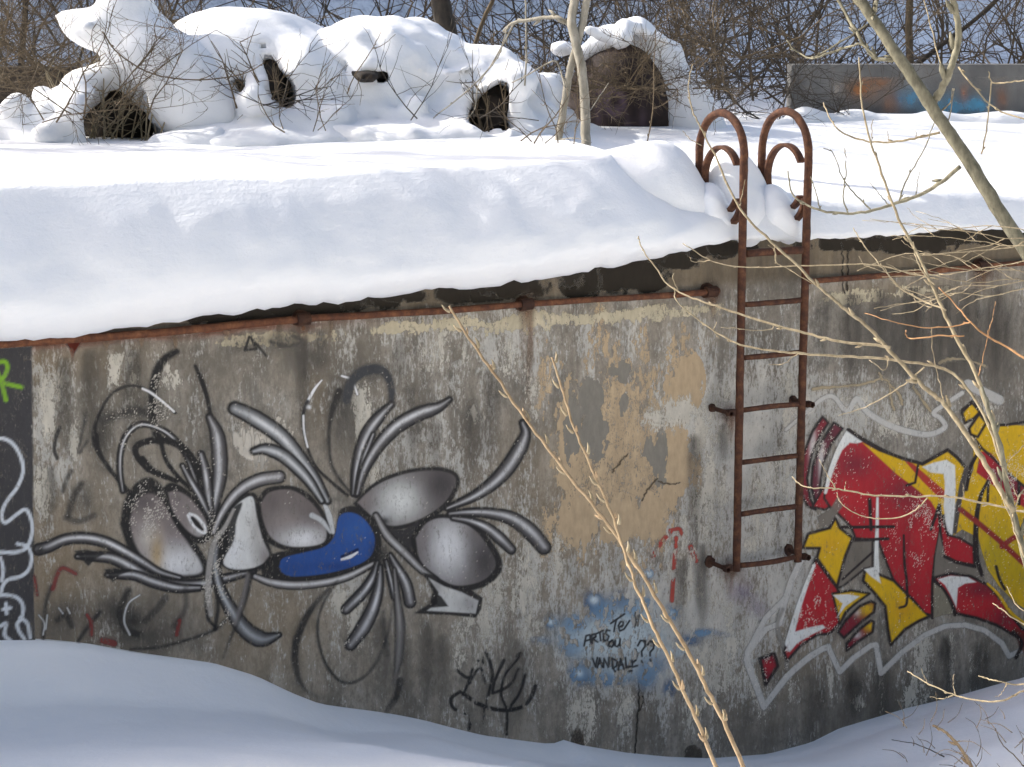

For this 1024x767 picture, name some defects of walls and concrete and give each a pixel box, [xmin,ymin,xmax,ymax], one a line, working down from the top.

peeling [417,329,486,381]
crack [641,478,680,501]
peeling [443,302,801,758]
peeling [826,654,834,699]